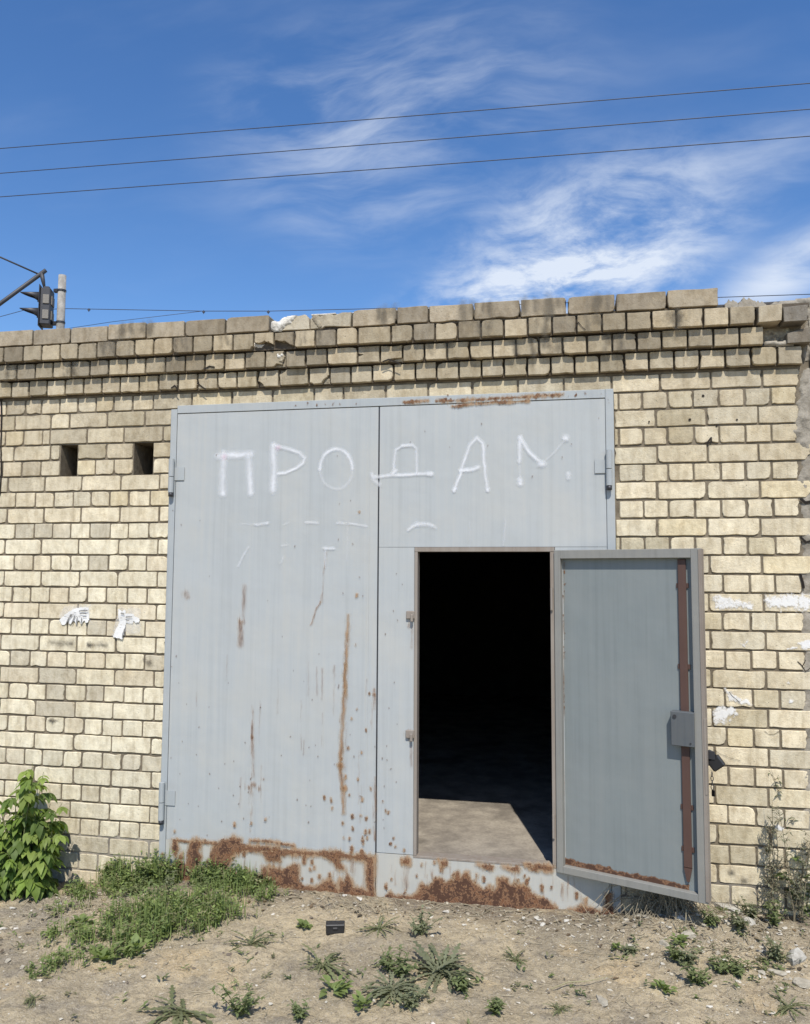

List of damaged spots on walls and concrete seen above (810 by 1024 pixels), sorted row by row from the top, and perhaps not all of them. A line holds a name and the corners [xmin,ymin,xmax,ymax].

rust [403,392,586,408]
rust [161,615,689,915]